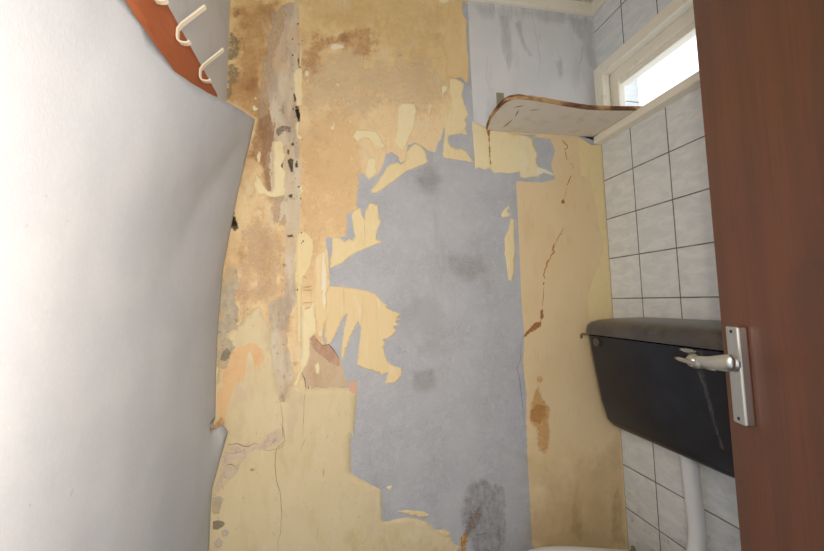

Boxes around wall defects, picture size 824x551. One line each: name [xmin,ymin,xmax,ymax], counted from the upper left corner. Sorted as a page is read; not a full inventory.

peeling [439,0,474,162]
peeling [209,1,460,551]
leakage [531,392,549,450]